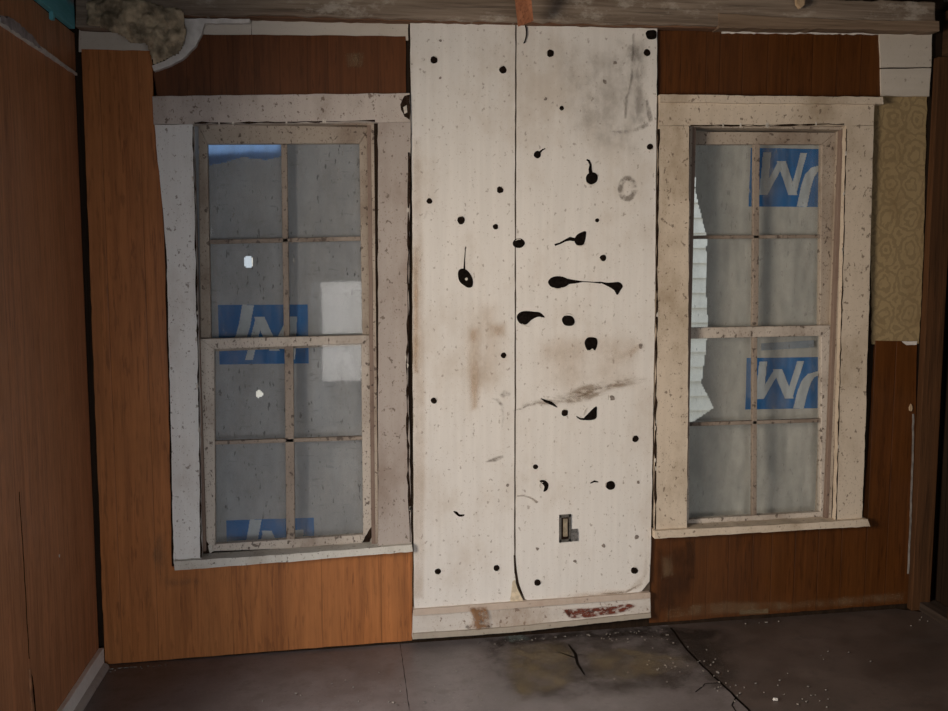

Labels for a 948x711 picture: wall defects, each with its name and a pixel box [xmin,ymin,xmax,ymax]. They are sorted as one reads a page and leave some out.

crack [19,492,30,659]
crack [670,628,751,711]